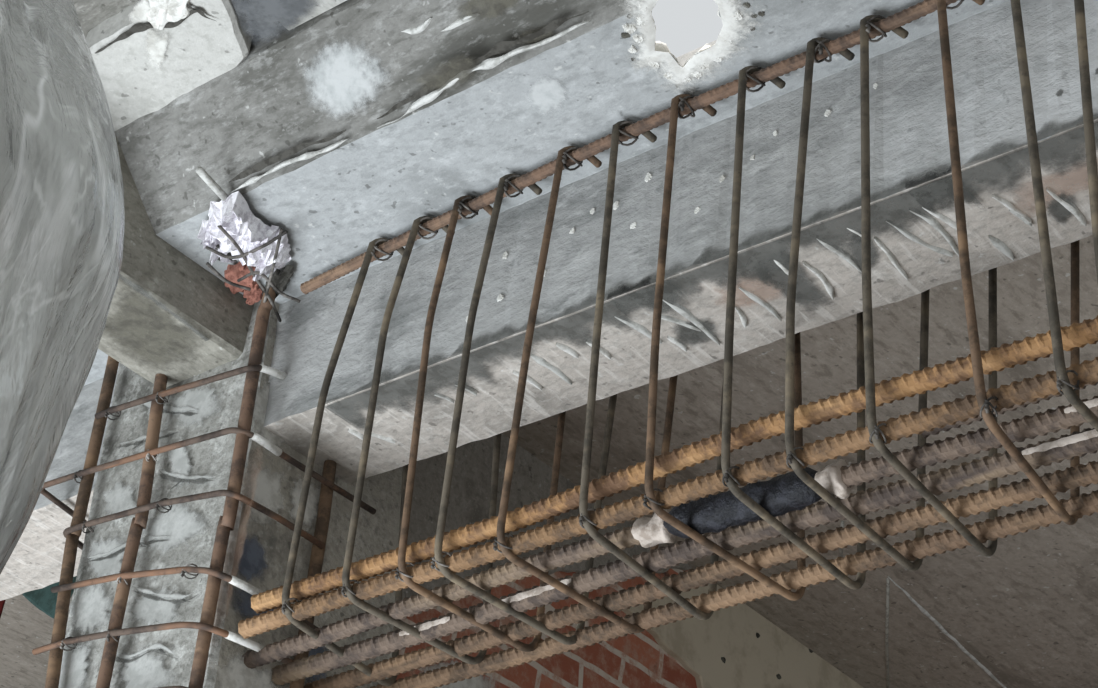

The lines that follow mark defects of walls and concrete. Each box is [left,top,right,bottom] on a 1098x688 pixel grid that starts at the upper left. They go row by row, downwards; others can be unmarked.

leakage [420,58,474,90]
leakage [528,79,565,113]
spalling [621,0,765,92]
spalling [196,166,301,322]
leakage [325,114,1098,429]
spalling [1046,187,1087,227]
spalling [661,300,720,345]
flaking render [243,463,321,526]
flaking render [407,433,576,545]
flaking render [406,503,605,567]
flaking render [402,521,632,600]
flaking render [646,603,864,688]